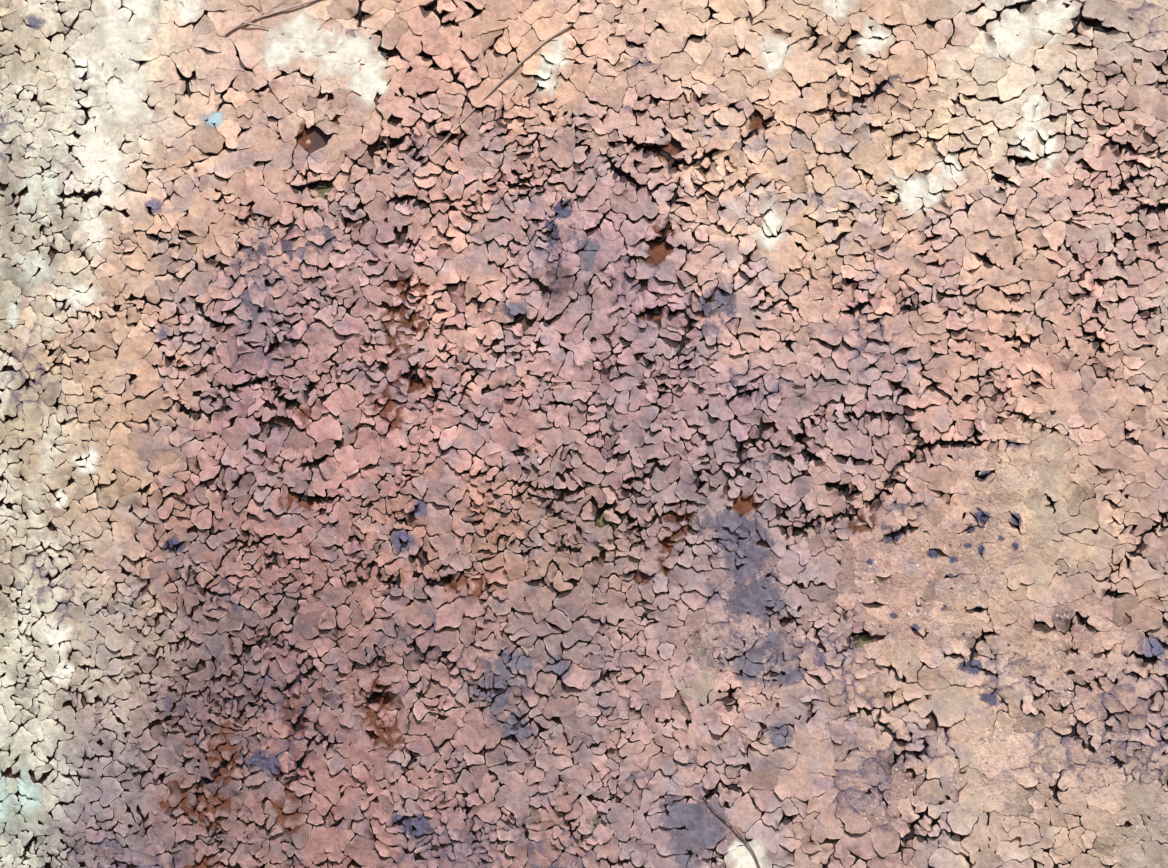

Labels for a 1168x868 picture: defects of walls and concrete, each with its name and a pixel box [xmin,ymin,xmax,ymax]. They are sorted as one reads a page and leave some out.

crack [358,2,465,86]
crack [604,136,717,242]
peeling [377,0,1168,286]
crack [1104,136,1168,251]
peeling [310,93,1168,481]
crack [174,337,337,428]
peeling [0,0,573,868]
crack [595,465,665,530]
peeling [366,282,1168,659]
crack [784,382,979,533]
peeling [291,435,1168,834]
peeling [282,738,1168,868]